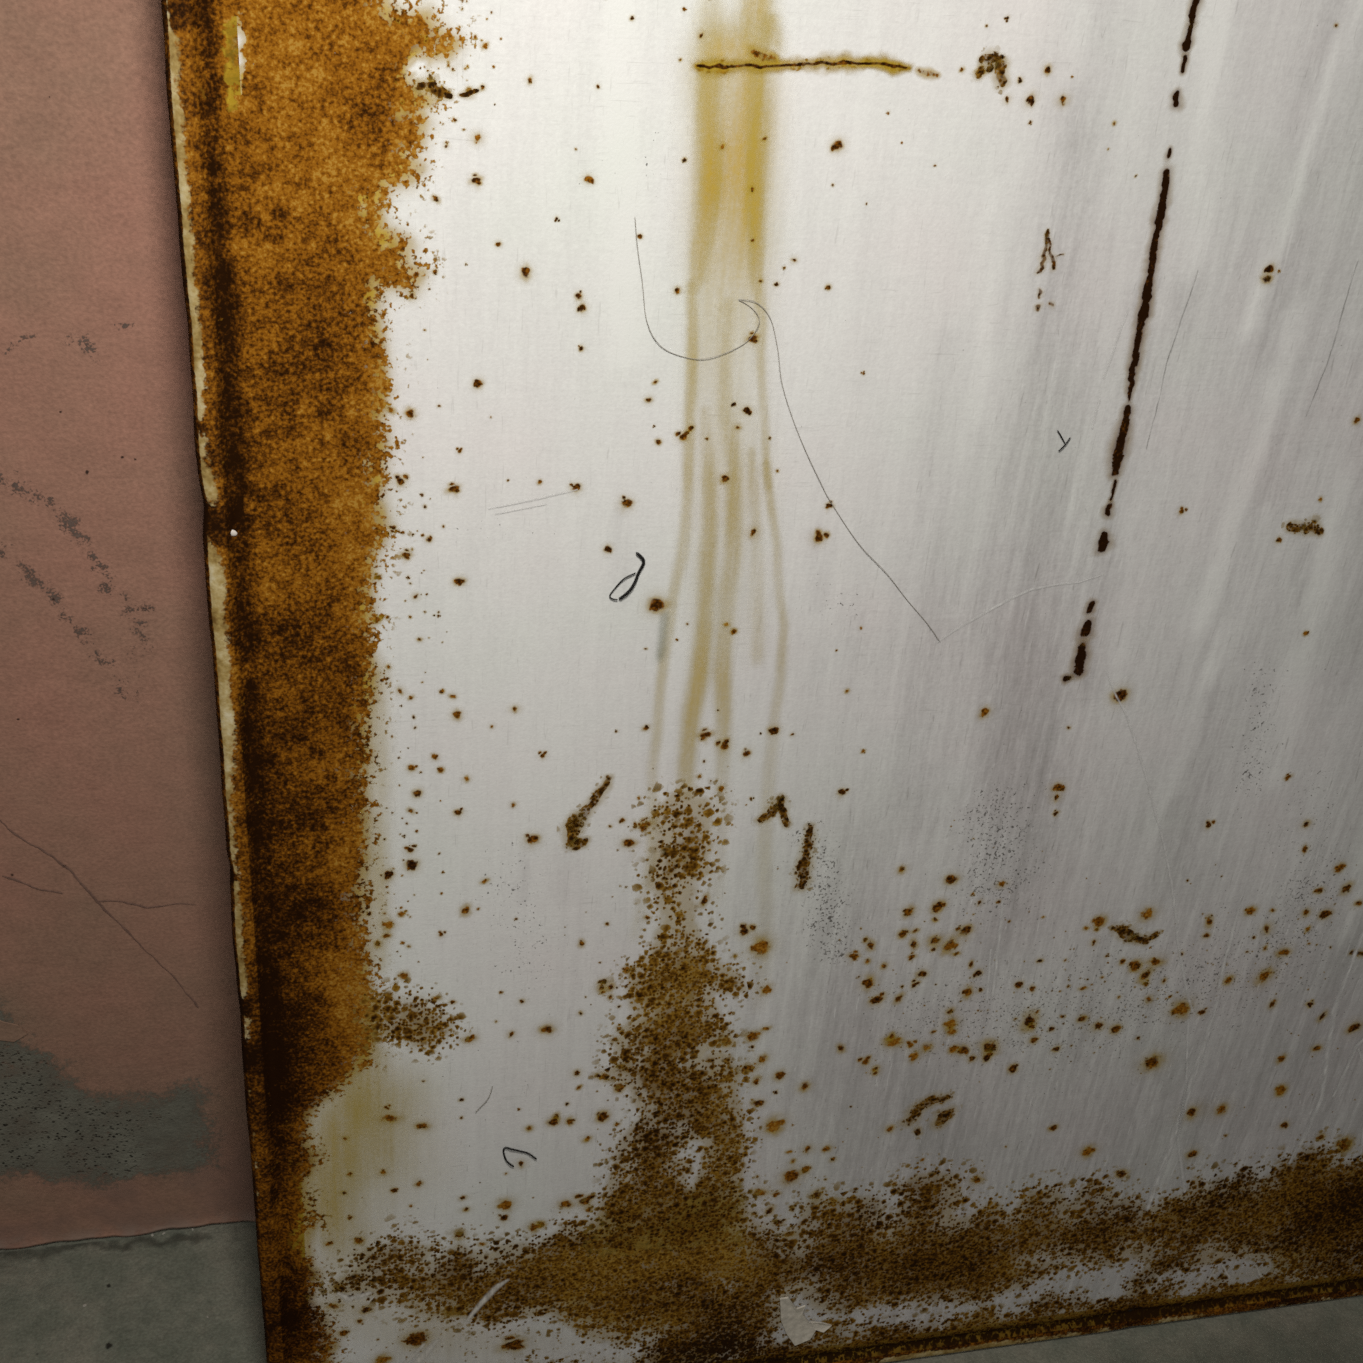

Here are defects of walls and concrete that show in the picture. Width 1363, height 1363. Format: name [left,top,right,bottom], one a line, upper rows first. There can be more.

rust [975,51,1007,91]
rust [1036,229,1064,311]
rust [1276,520,1324,542]
rust [649,598,666,612]
rust [565,775,611,850]
rust [757,794,791,828]
rust [404,844,418,871]
rust [794,823,814,889]
rust [849,901,982,1004]
rust [1084,908,1166,1002]
rust [886,1009,997,1062]
rust [886,1093,955,1136]